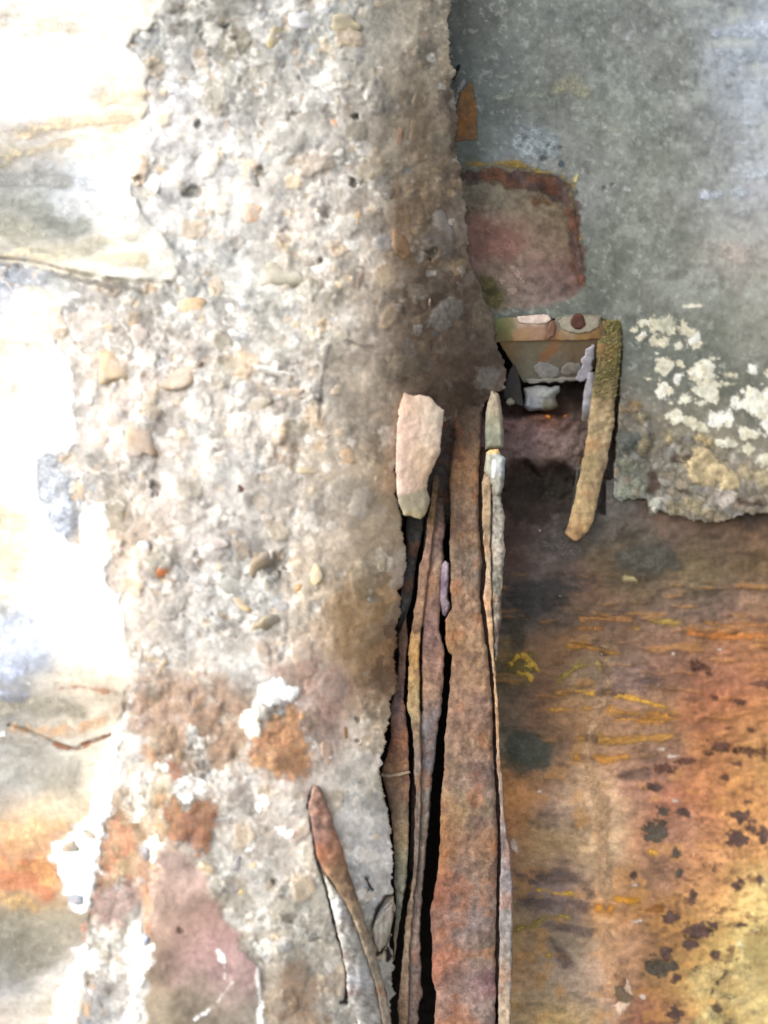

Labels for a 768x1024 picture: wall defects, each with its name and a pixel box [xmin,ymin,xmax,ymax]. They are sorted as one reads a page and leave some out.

rust [455,79,477,142]
rust [469,218,524,307]
rust [460,160,586,285]
spalling [0,0,605,1024]
rust [739,512,768,528]
rust [652,618,768,650]
rust [138,679,244,780]
rust [211,704,311,780]
rust [369,406,681,1024]
rust [157,794,216,856]
crack [366,878,395,962]